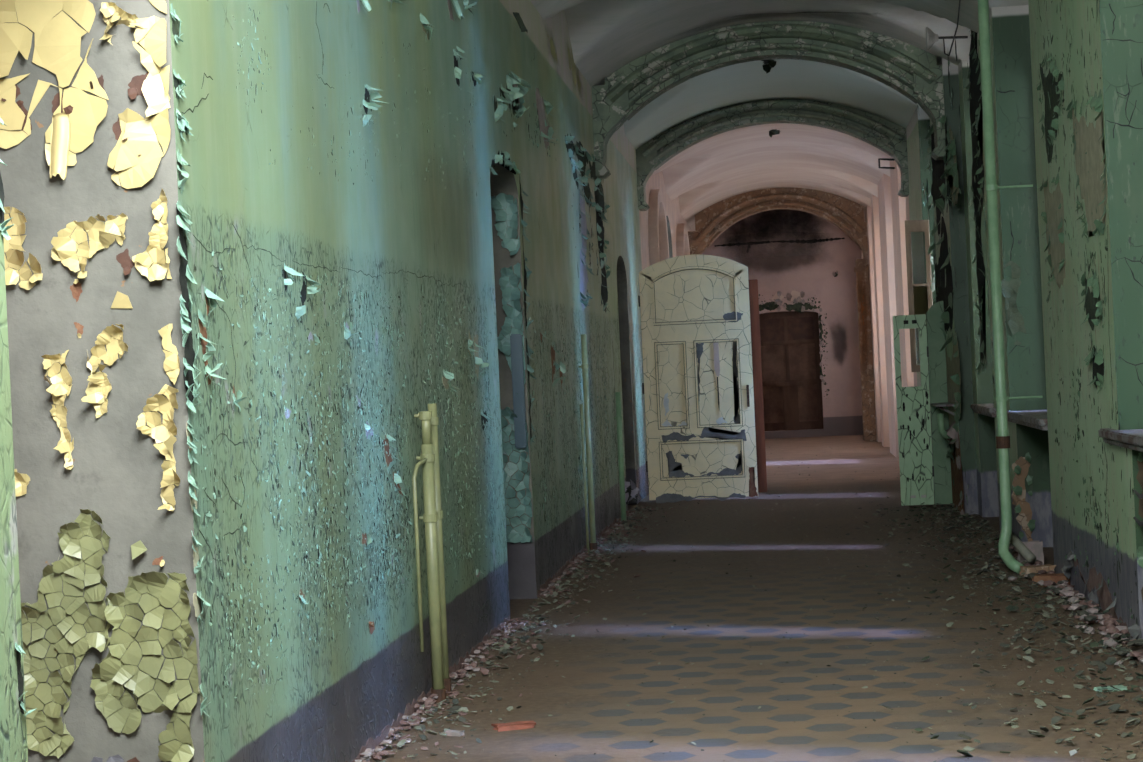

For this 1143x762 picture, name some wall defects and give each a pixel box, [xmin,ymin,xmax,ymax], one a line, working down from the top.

crack [182,73,213,114]
crack [316,3,333,88]
peeling [447,0,477,22]
peeling [453,46,483,86]
peeling [513,12,528,32]
crack [1099,0,1143,138]
peeling [494,70,611,313]
leakage [728,209,822,271]
peeling [420,151,567,577]
peeling [758,290,829,399]
leakage [832,326,846,362]
peeling [662,342,747,477]